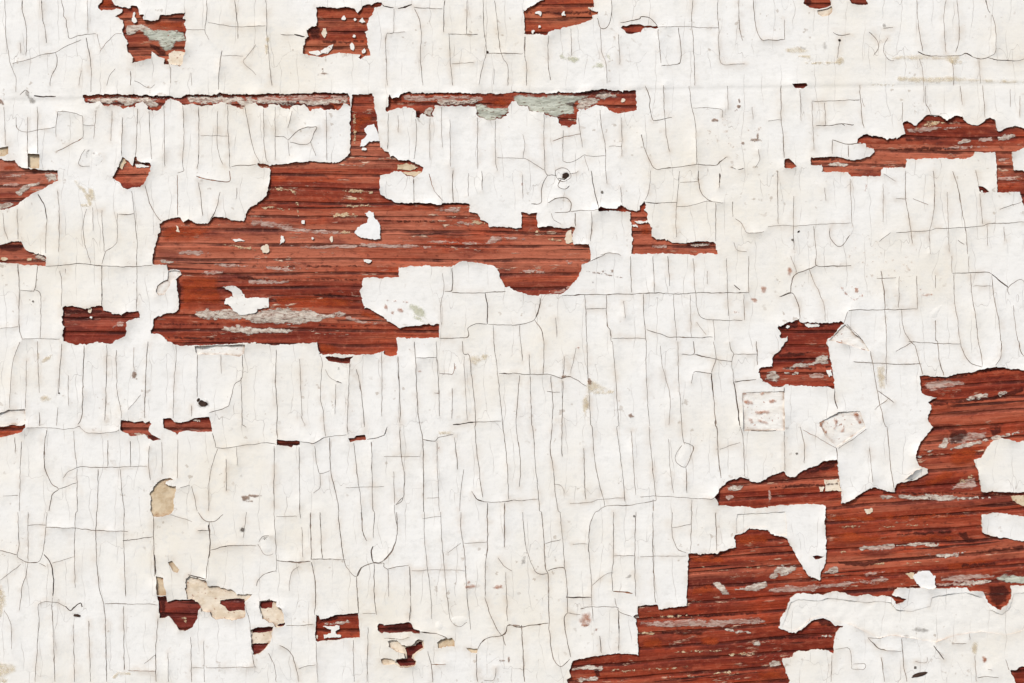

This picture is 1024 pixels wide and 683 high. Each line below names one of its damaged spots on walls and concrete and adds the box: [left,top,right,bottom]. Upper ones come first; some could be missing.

peeling [62,306,140,345]
crack [4,0,327,300]
peeling [303,2,382,59]
peeling [83,89,637,364]
crack [0,244,758,682]
crack [383,1,572,85]
crack [518,116,622,241]
crack [597,1,864,315]
peeling [567,367,1024,683]
peeling [742,319,869,431]
peeling [810,115,1024,205]
crack [836,172,1023,487]